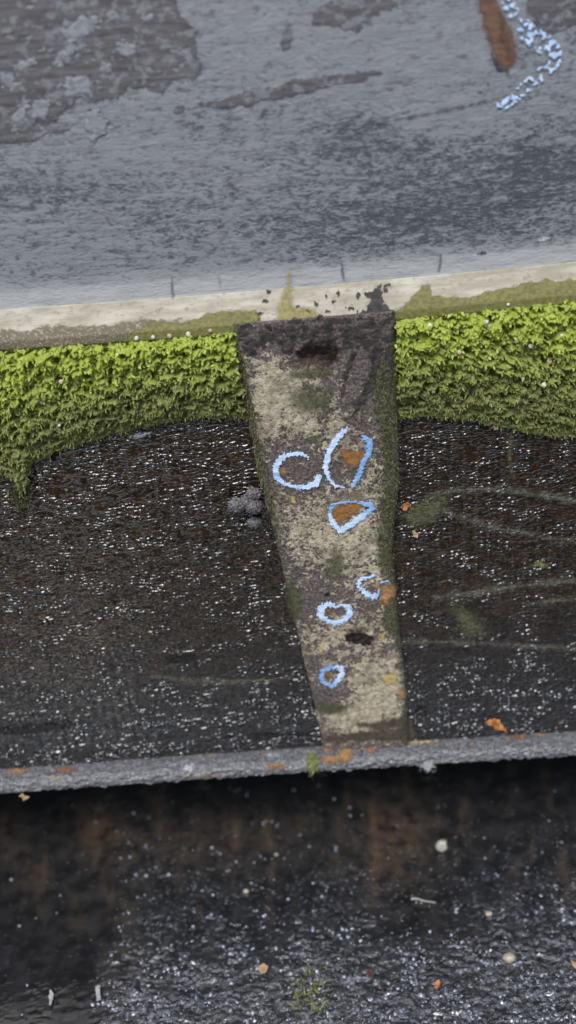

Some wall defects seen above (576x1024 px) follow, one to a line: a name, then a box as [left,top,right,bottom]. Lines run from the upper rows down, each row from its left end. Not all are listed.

peeling [0,0,202,144]
peeling [198,70,382,108]
peeling [311,0,403,33]
rust [479,0,517,72]